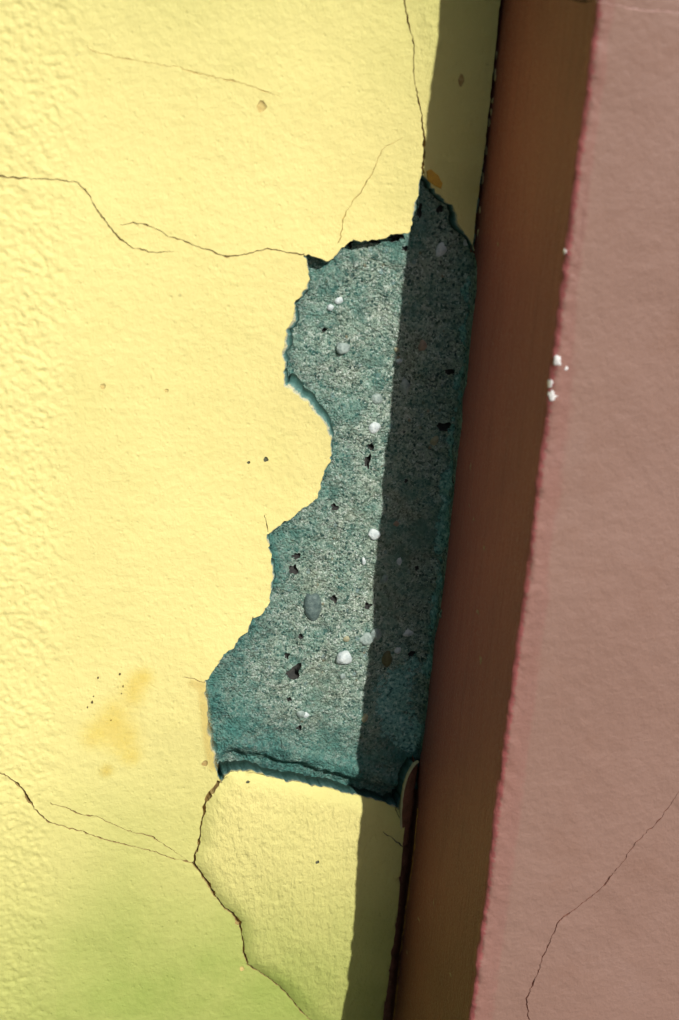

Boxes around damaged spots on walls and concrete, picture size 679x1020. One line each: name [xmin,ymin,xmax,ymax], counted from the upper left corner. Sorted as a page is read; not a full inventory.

crack [0,175,304,258]
crack [86,46,281,98]
crack [338,0,426,243]
flaking render [201,169,479,846]
crack [0,773,311,1020]
crack [525,792,679,1020]